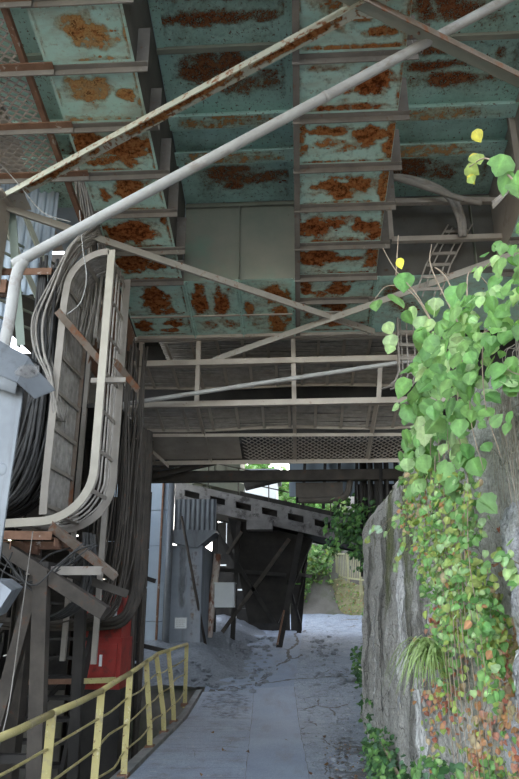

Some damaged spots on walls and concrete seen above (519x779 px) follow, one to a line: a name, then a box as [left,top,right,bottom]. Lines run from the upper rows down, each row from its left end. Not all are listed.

corrosion [397,0,485,23]
corrosion [27,0,407,190]
corrosion [311,47,494,112]
corrosion [409,107,476,120]
corrosion [89,180,150,211]
corrosion [300,121,471,312]
corrosion [102,192,240,335]
corrosion [244,284,370,332]
crack [192,630,352,775]